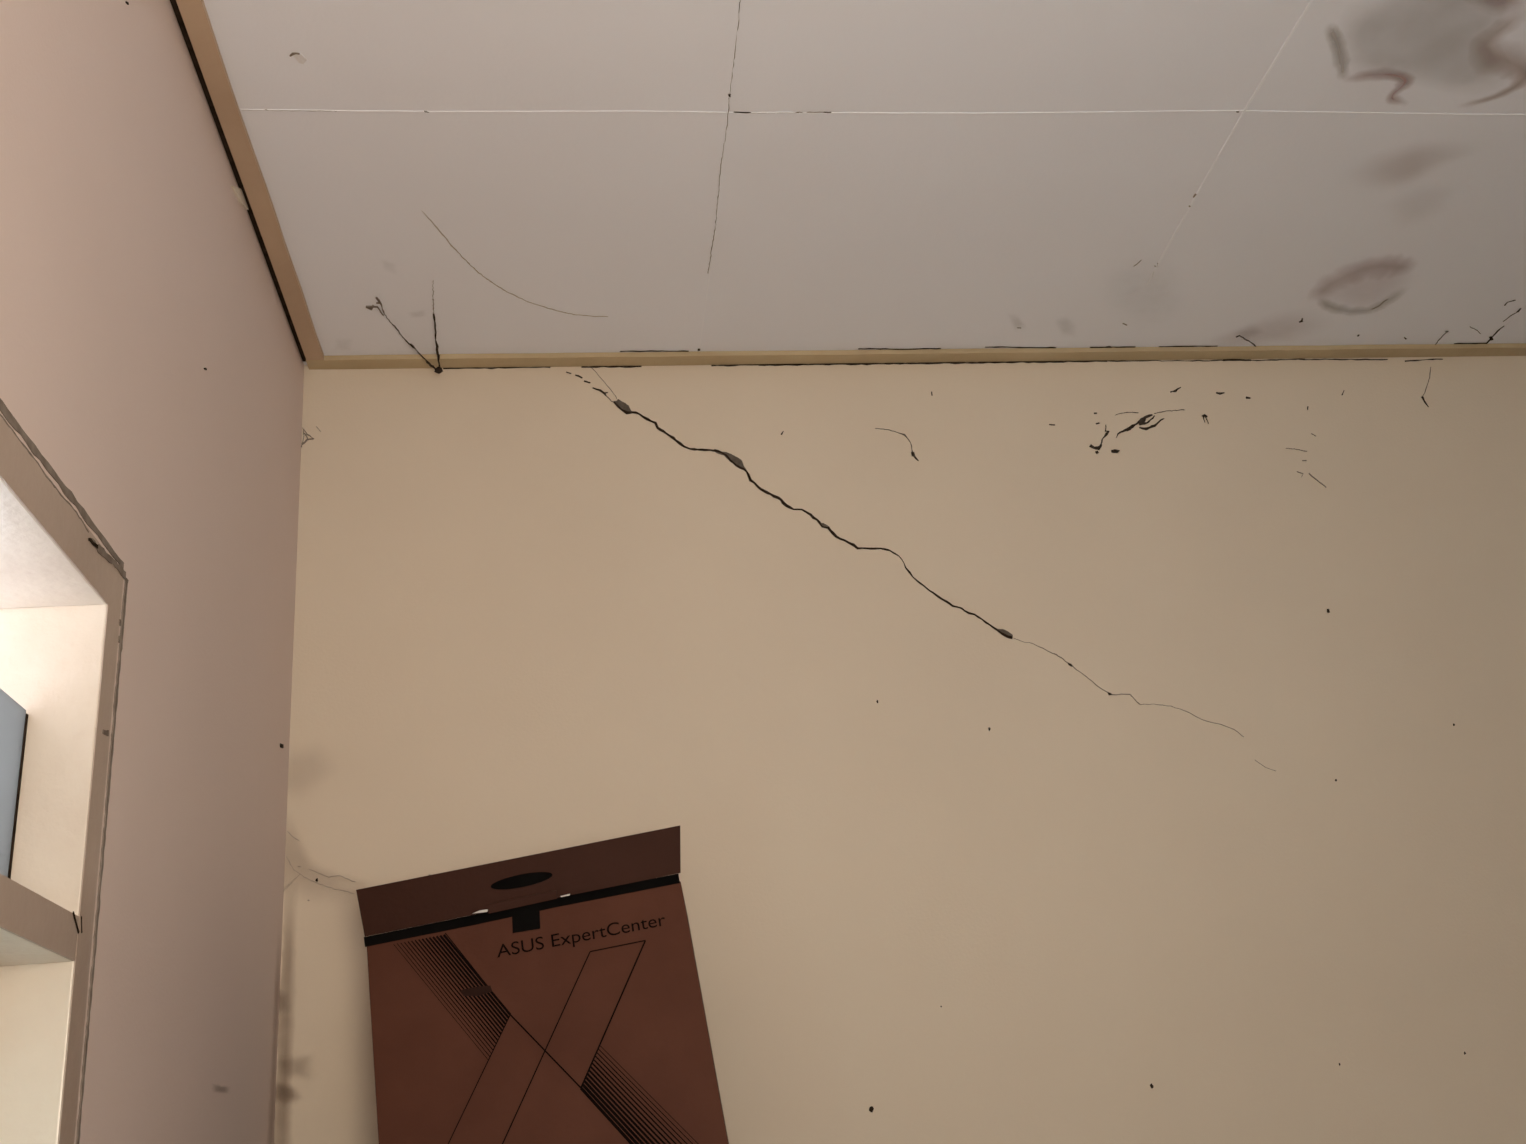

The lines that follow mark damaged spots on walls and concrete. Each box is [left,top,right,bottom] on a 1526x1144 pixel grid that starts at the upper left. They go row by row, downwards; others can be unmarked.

crack [422,211,608,317]
crack [443,300,1521,771]